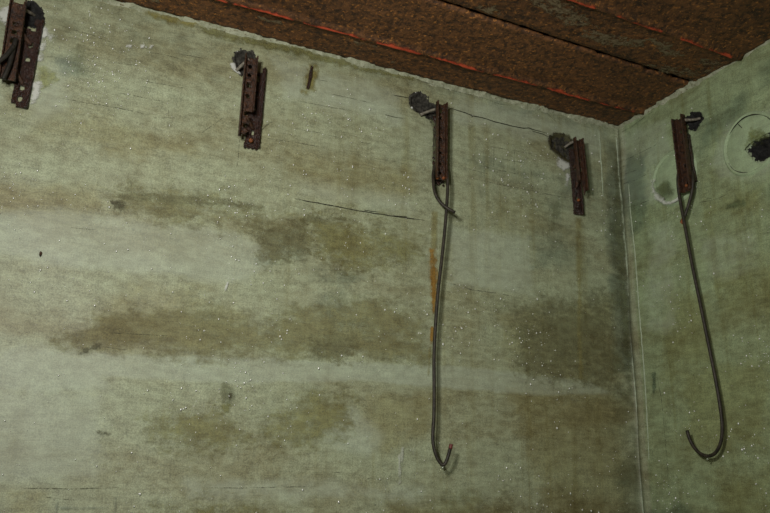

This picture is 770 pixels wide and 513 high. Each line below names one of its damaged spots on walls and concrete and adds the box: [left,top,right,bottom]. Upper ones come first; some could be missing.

leakage [114,185,416,267]
crack [299,199,420,220]
corrosion [430,249,438,312]
leakage [67,301,429,363]